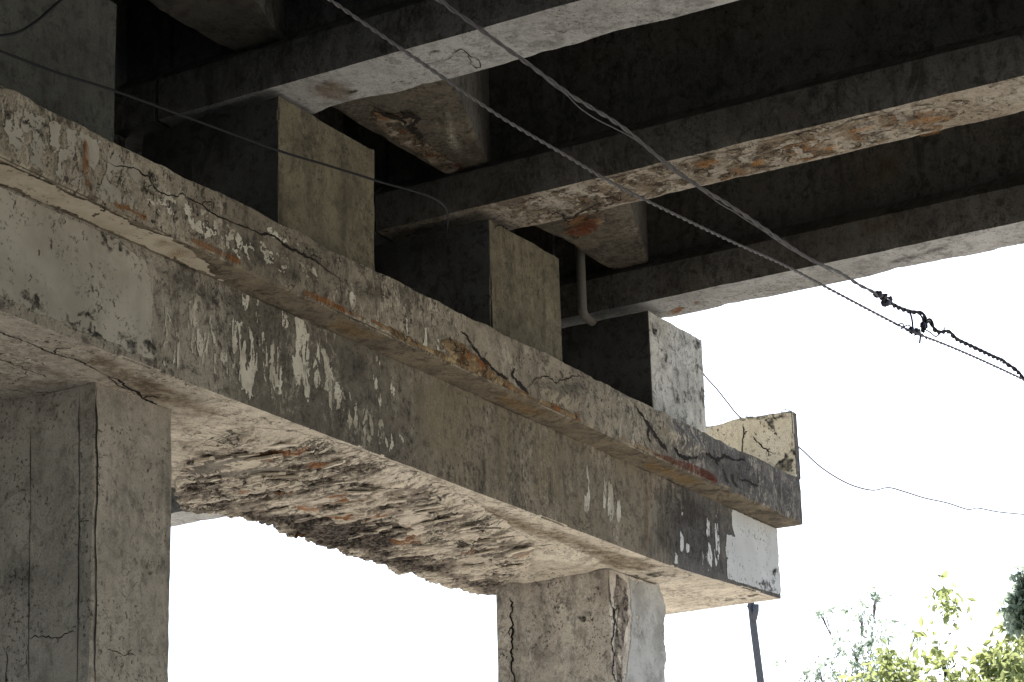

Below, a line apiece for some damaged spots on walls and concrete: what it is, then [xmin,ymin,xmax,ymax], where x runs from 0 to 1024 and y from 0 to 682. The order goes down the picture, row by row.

crack [100,157,343,303]
spalling [0,96,538,596]
spalling [371,318,589,425]
crack [461,331,583,395]
crack [636,406,773,487]
crack [0,332,160,682]
peeling [603,478,621,523]
crack [507,598,515,682]
crack [608,580,617,681]